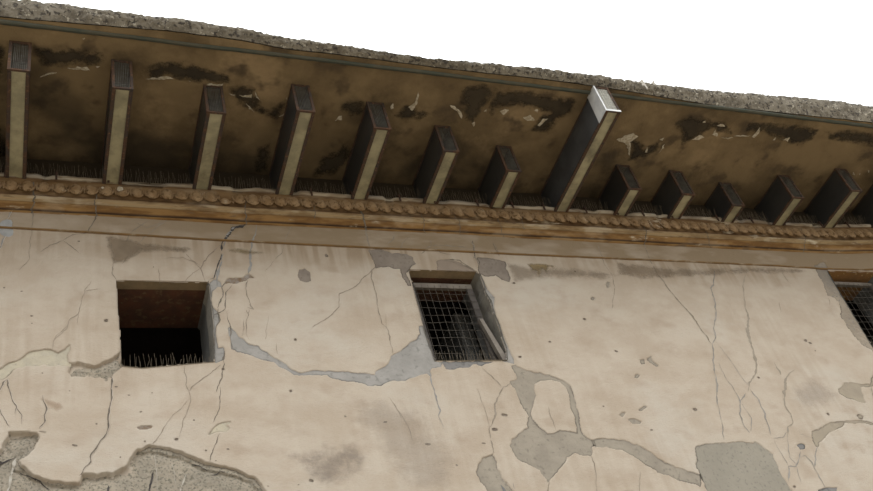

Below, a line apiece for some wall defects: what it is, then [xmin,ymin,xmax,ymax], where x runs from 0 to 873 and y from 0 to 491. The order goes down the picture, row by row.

leakage [35,49,101,66]
leakage [150,62,284,119]
leakage [462,85,575,131]
leakage [675,117,731,142]
leakage [746,123,818,143]
leakage [829,130,873,147]
crack [150,201,290,475]
crack [643,227,825,486]
crack [0,379,48,433]
crack [80,377,114,475]
crack [0,458,49,490]
peeling [0,426,269,491]